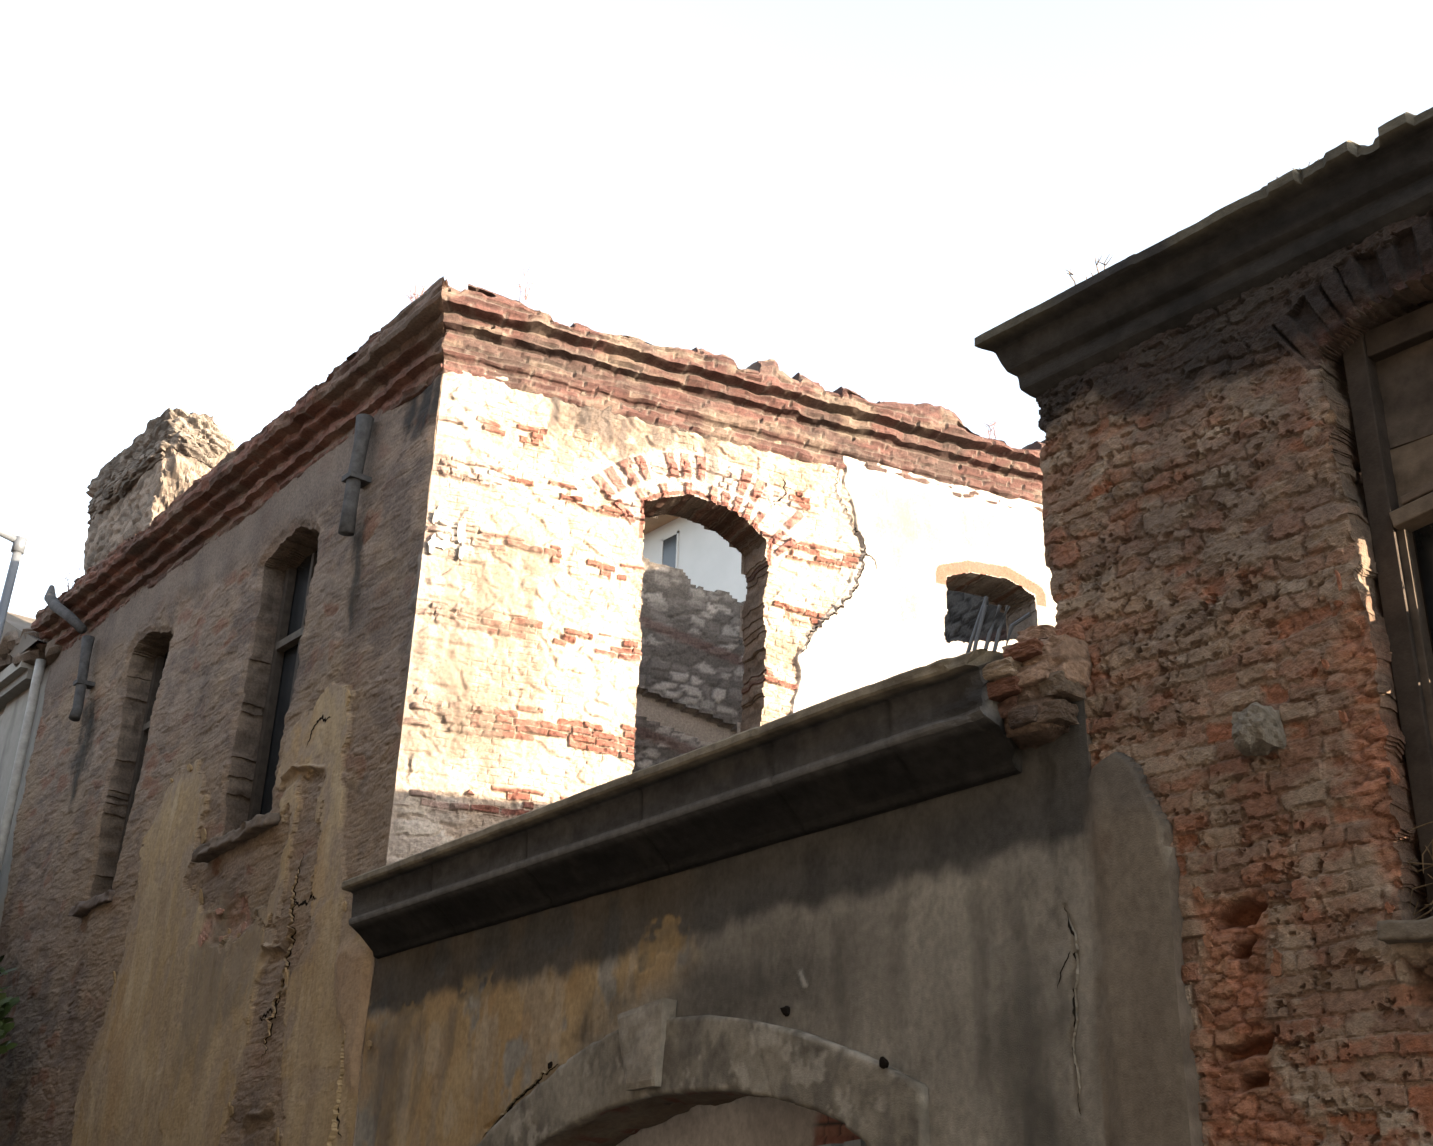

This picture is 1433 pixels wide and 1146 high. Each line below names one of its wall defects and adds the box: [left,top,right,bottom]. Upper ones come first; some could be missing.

spalling [982,624,1093,750]
spalling [1321,570,1403,915]
peeling [70,682,374,1146]
crack [1057,907,1081,1114]
spalling [1182,886,1319,1146]
spalling [1402,959,1433,1012]